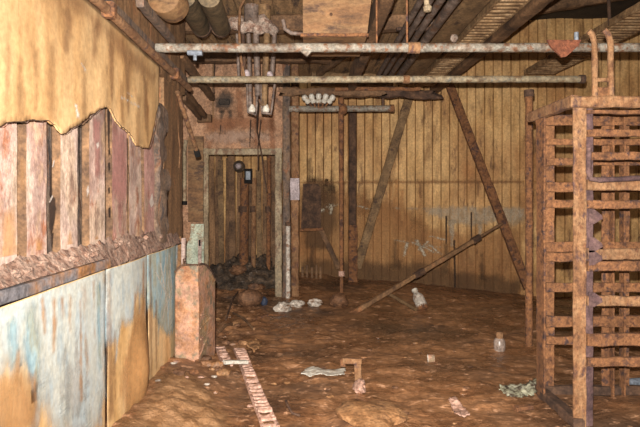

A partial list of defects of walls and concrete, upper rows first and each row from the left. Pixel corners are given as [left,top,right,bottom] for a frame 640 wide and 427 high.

peeling [64,105,103,174]
peeling [0,246,176,427]